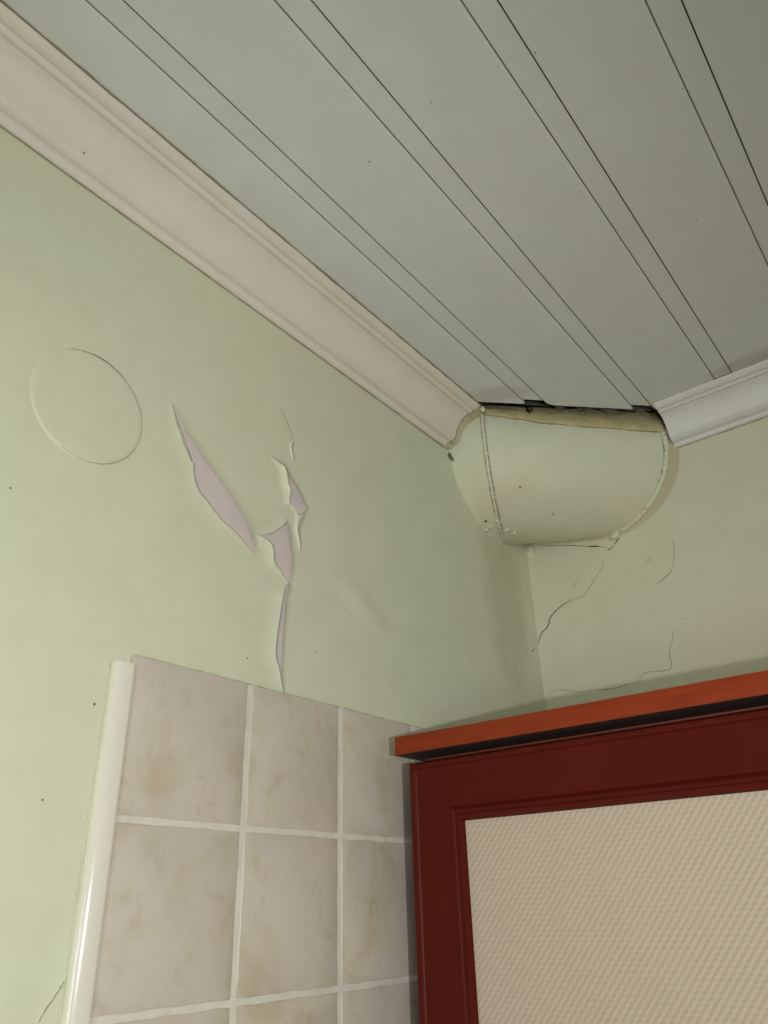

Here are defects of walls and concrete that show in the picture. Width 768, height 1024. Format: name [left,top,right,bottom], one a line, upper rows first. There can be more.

peeling [256,454,311,692]
crack [532,538,619,652]
crack [546,635,673,699]